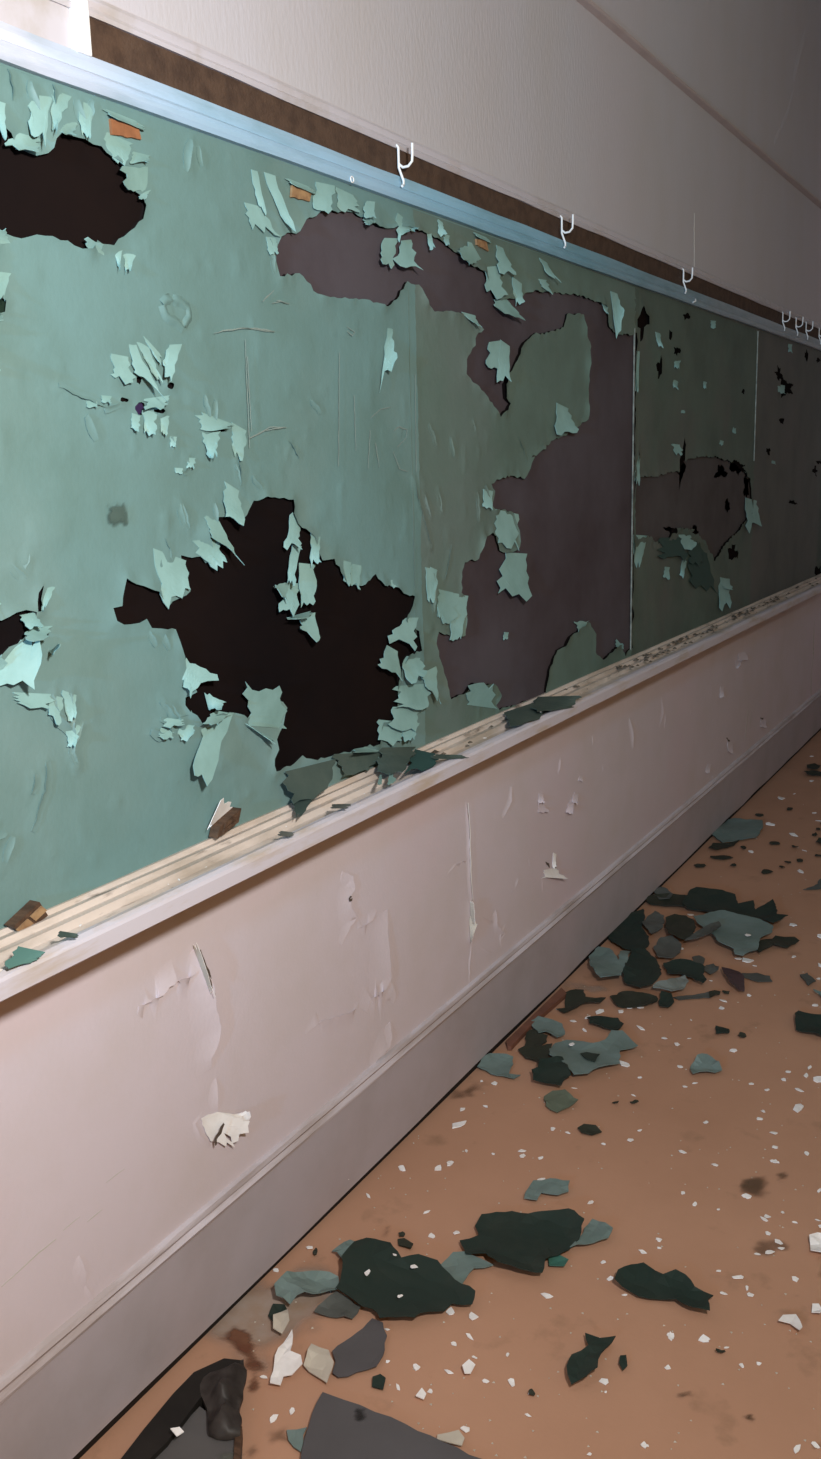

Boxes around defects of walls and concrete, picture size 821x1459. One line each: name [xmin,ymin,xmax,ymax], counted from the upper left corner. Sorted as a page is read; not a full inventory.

peeling [0,90,151,272]
peeling [0,272,11,321]
peeling [86,336,247,474]
peeling [775,369,792,397]
peeling [114,169,762,837]
peeling [0,586,81,747]
peeling [541,853,568,879]